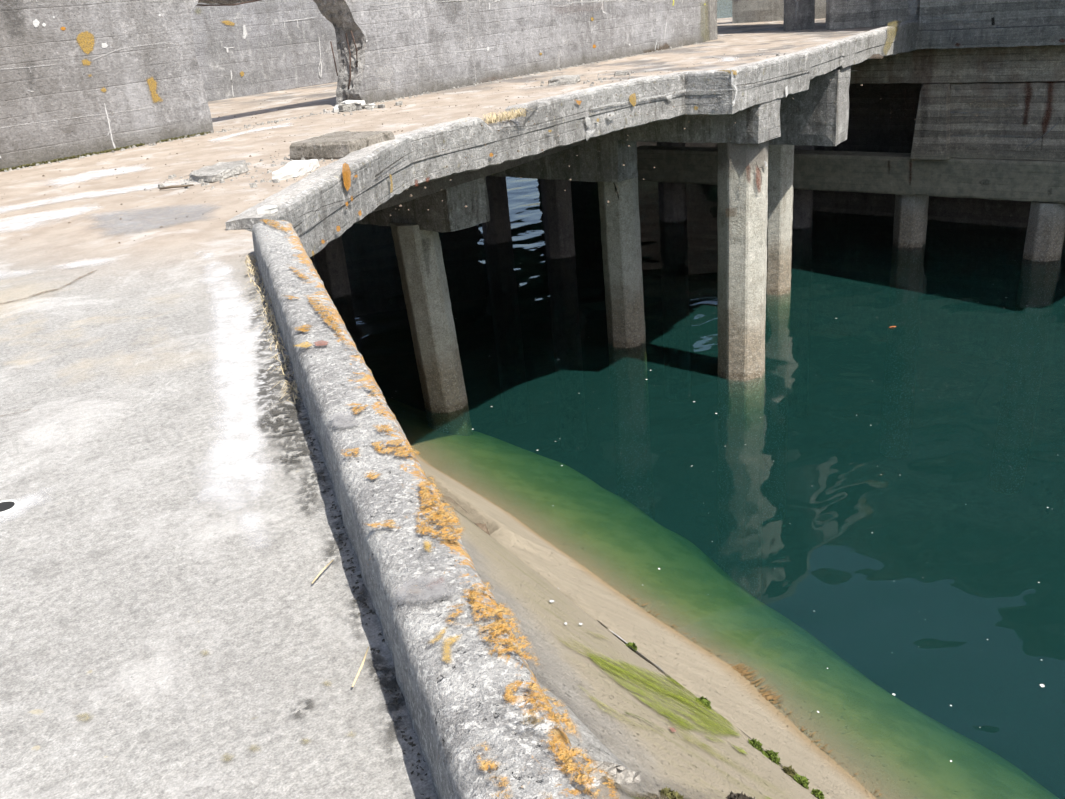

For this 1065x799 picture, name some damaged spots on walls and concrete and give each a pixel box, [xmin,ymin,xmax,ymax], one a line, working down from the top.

rust [1042,81,1053,135]
rust [746,166,761,192]